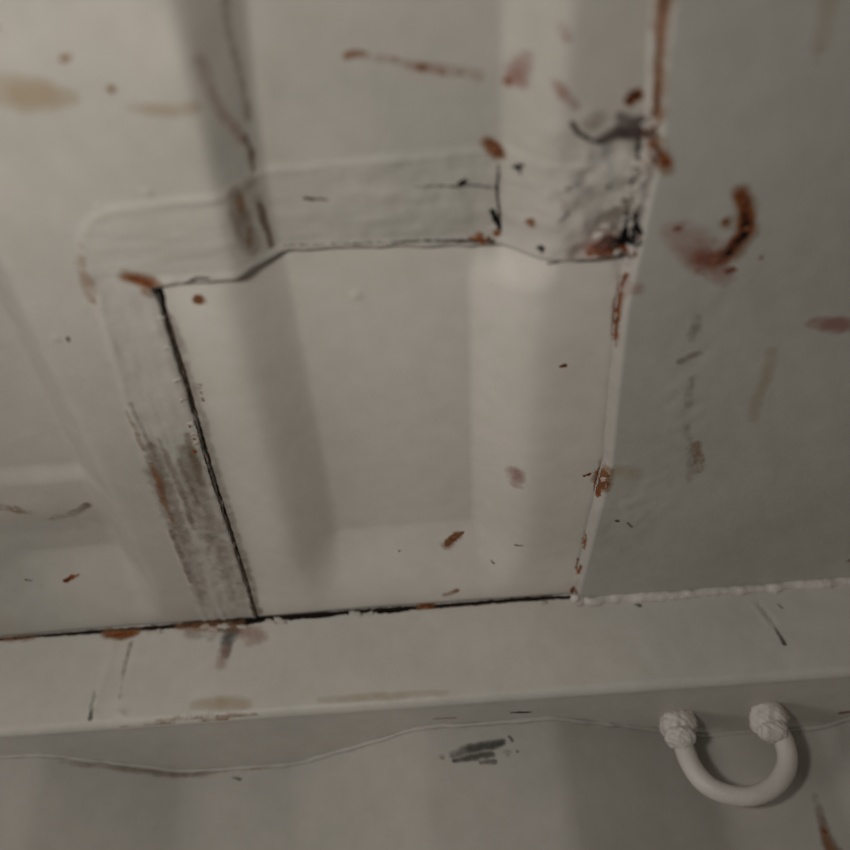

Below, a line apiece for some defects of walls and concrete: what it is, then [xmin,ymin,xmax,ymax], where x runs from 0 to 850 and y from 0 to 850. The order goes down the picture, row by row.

peeling [570,87,660,168]
rust [646,118,672,168]
peeling [592,223,621,240]
rust [692,186,756,275]
crack [547,253,631,264]
rust [122,273,166,304]
crack [184,276,210,284]
rust [611,272,630,341]
crack [0,297,571,641]
rust [583,467,611,498]
rust [444,531,464,547]